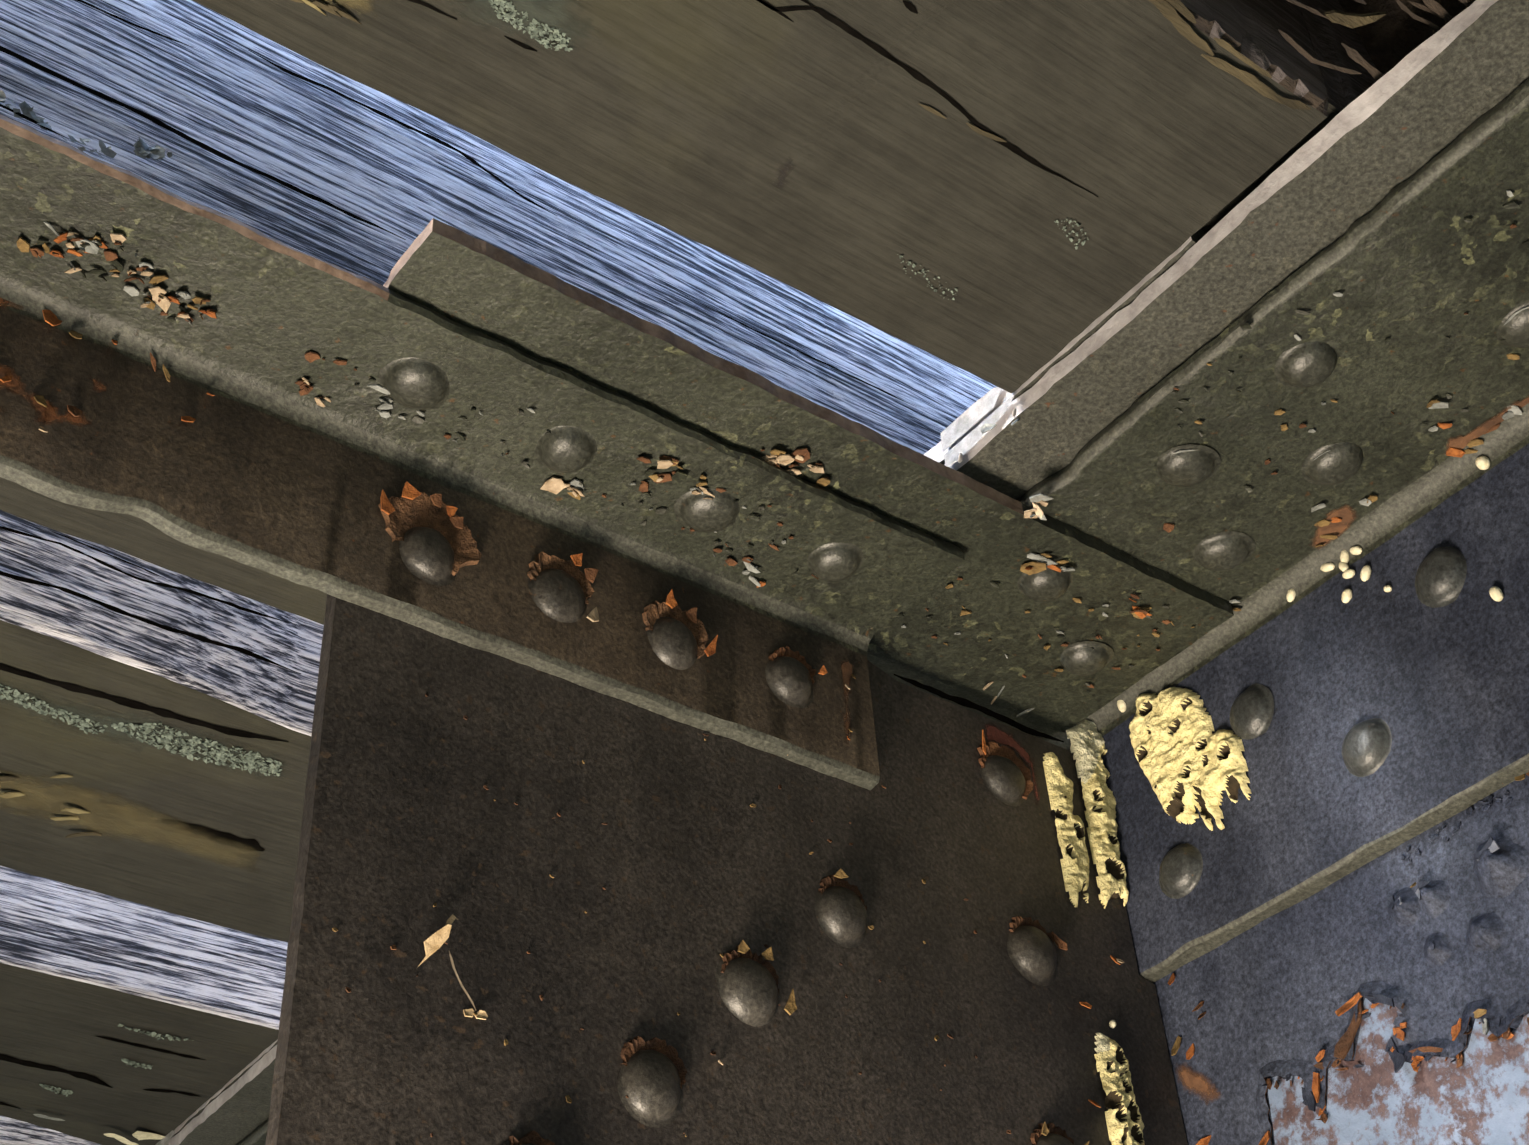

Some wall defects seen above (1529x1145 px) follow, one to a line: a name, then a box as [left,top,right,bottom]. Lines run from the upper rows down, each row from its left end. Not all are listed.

crack [504,36,537,52]
crack [757,0,1098,197]
rust [42,310,82,339]
rust [0,365,89,433]
crack [894,674,1064,743]
peeling [1255,981,1529,1145]